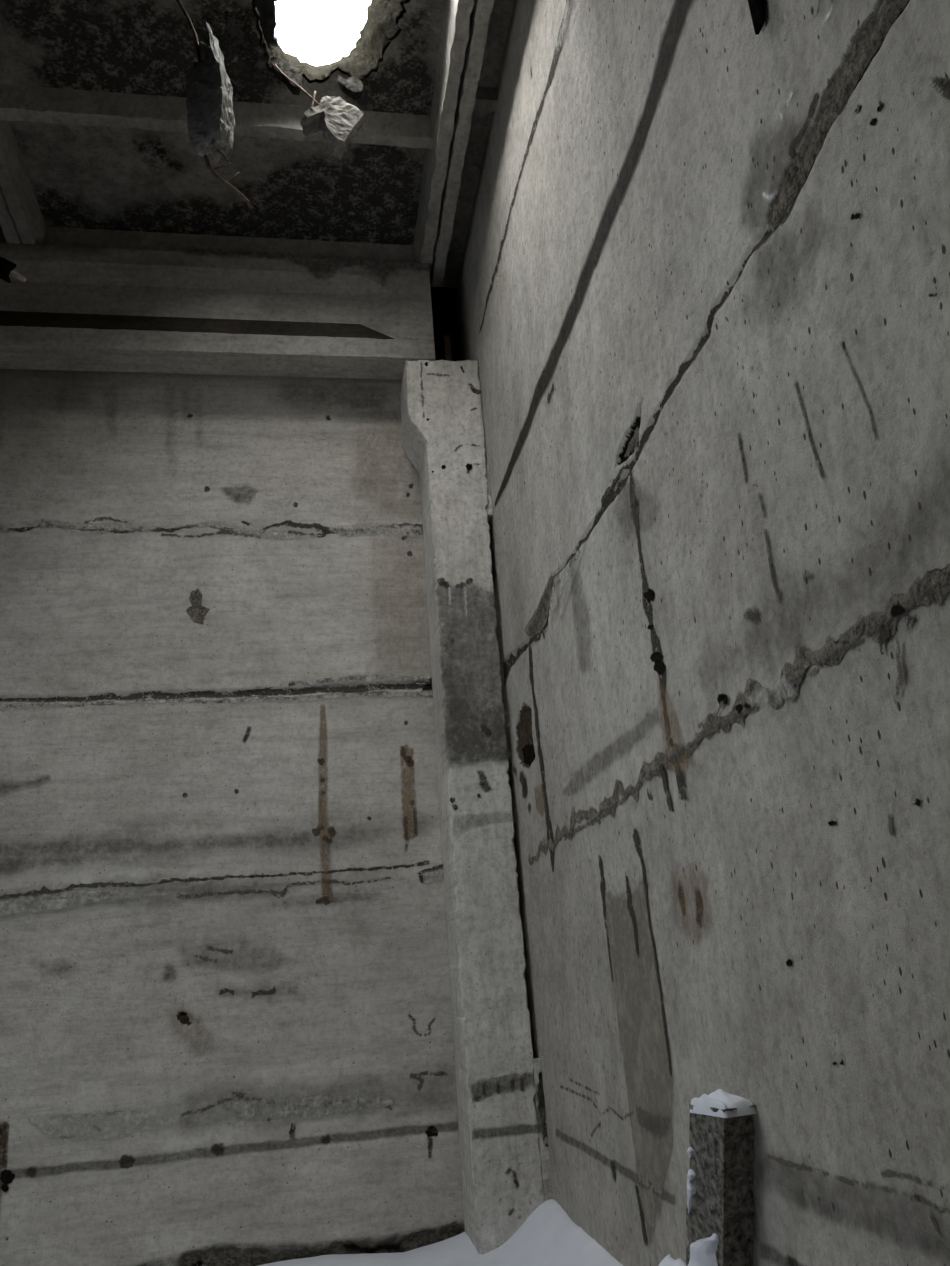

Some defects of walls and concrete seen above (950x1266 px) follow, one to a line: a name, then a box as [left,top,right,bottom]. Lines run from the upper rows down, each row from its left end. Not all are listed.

water stain [1,0,285,104]
spalling [252,0,405,81]
water stain [346,9,434,115]
water stain [34,140,428,282]
crack [503,0,950,872]
crack [0,517,423,540]
crack [0,673,433,710]
rust [312,707,335,905]
rust [401,745,417,851]
spalling [513,703,535,812]
crack [0,860,430,916]
rust [0,1122,15,1194]